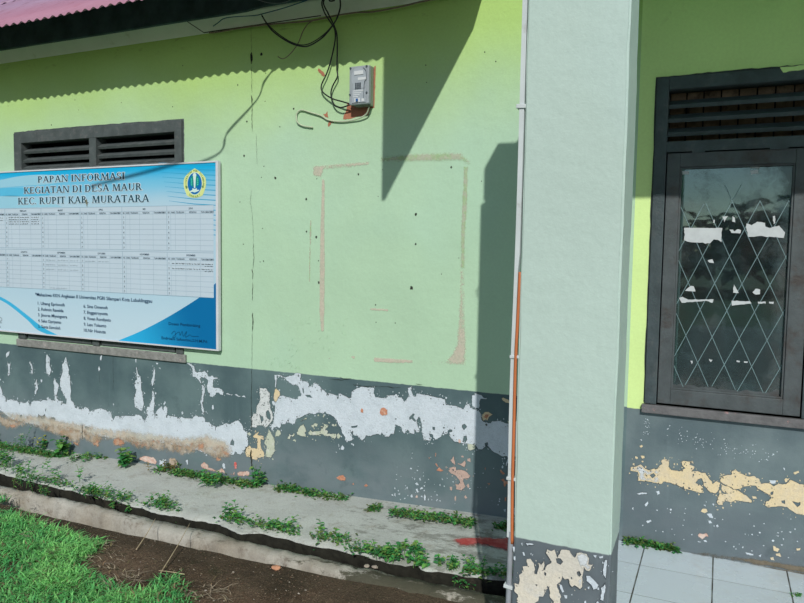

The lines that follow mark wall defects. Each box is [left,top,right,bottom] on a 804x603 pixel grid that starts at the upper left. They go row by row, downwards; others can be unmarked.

peeling [0,351,517,506]
peeling [629,418,804,527]
peeling [513,542,613,603]